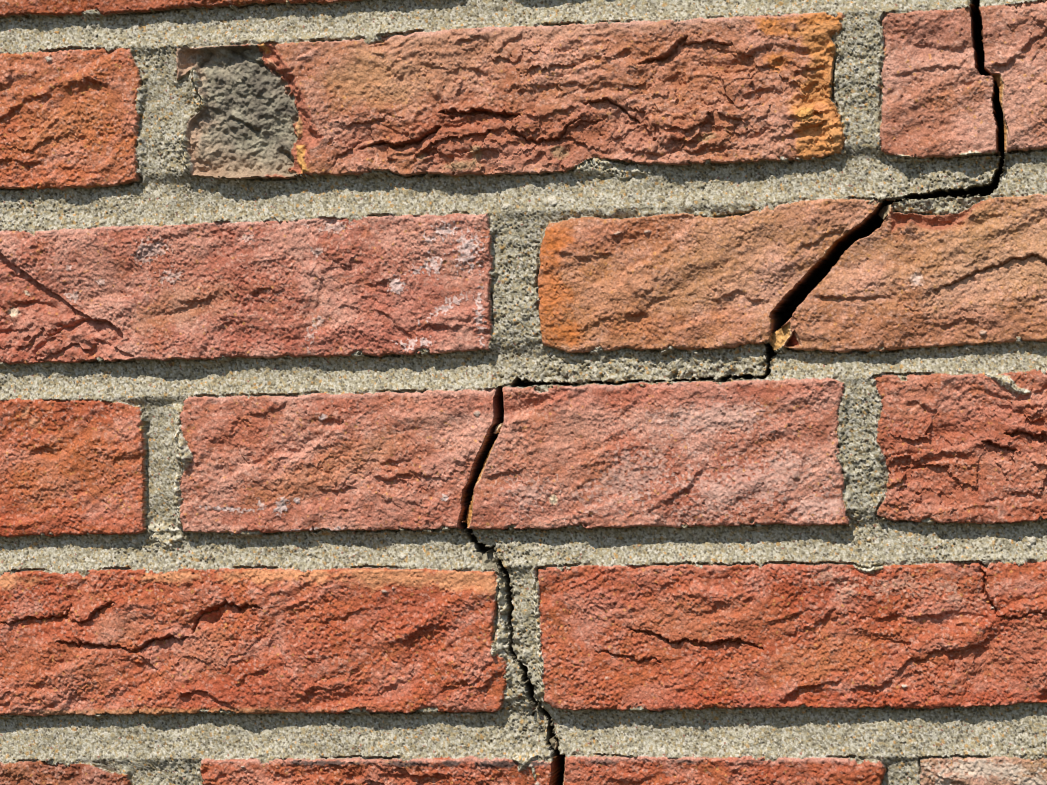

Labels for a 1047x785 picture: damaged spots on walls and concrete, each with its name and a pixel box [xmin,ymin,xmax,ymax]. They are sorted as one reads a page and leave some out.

spalling [176,42,325,180]
crack [359,99,641,150]
crack [503,0,1008,388]
crack [982,431,1047,452]
crack [460,422,566,785]
crack [980,563,1047,620]
crack [596,627,764,664]